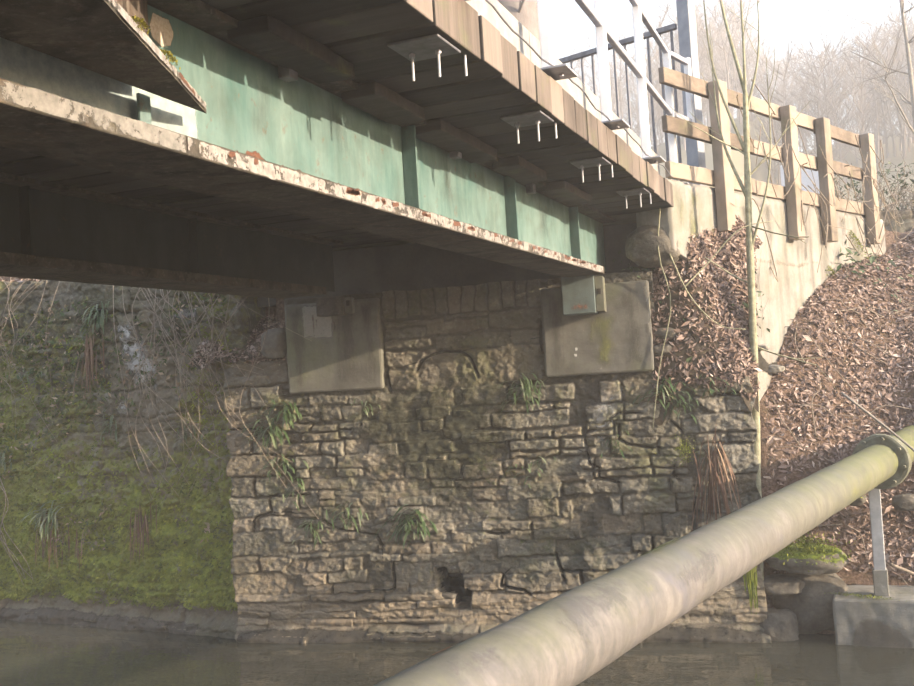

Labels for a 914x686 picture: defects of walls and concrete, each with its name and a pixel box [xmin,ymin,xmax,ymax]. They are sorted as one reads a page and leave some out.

peeling [109,0,206,108]
corrosion [229,151,266,165]
peeling [0,81,603,273]
crack [578,449,620,483]
crack [500,567,537,599]
crack [556,553,565,579]